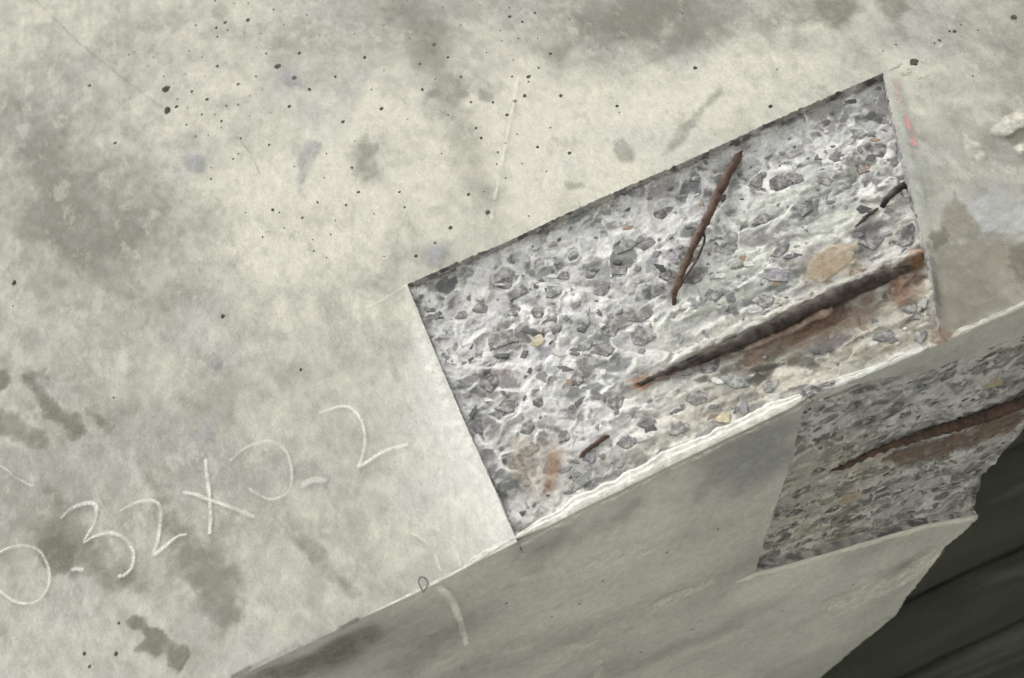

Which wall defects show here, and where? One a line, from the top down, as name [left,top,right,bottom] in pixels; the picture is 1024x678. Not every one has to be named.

spalling [362,42,1024,618]
corrosion [738,293,879,369]
corrosion [883,413,1024,467]